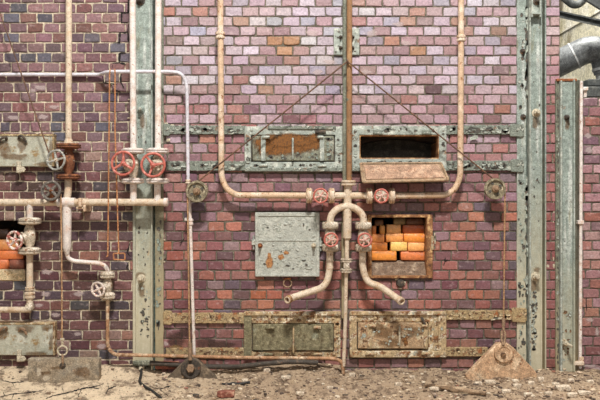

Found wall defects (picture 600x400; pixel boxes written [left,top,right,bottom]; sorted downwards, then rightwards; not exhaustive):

peeling [518,5,534,109]
corrosion [255,133,320,155]
corrosion [266,251,289,268]
peeling [518,176,540,262]
peeling [140,274,161,338]
peeling [518,269,538,355]